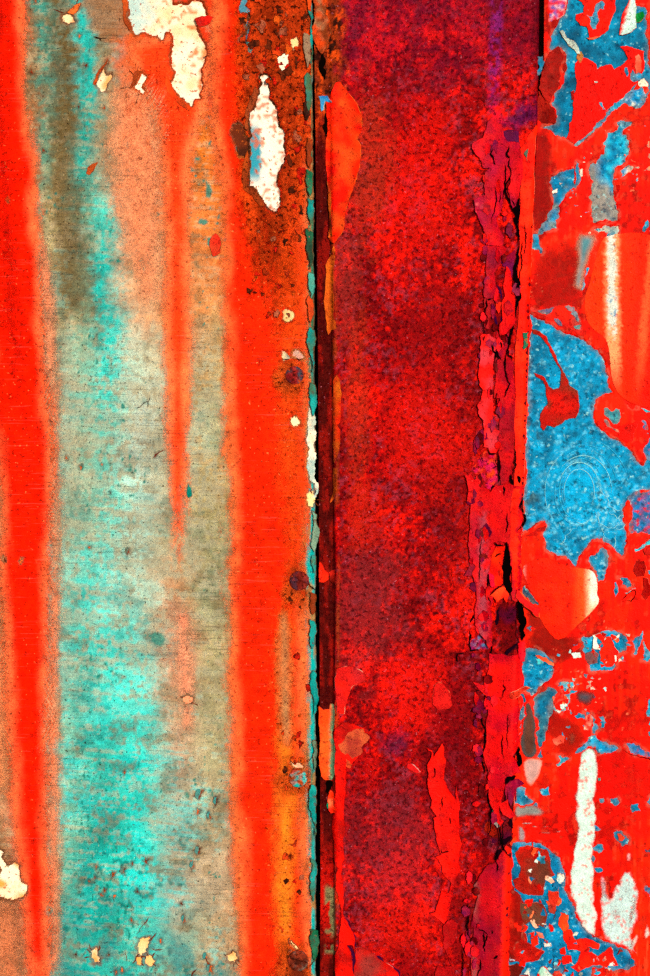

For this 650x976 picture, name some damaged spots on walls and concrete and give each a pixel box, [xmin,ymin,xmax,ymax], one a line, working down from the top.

peeling [121,0,213,111]
peeling [226,0,362,585]
corrosion [0,0,63,976]
corrosion [105,0,311,976]
peeling [407,0,650,976]
peeling [288,591,317,649]
peeling [305,670,319,715]
spalling [276,722,318,791]
peeling [0,850,27,900]
peeling [283,858,318,902]
peeling [115,933,163,975]
peeling [279,926,319,961]